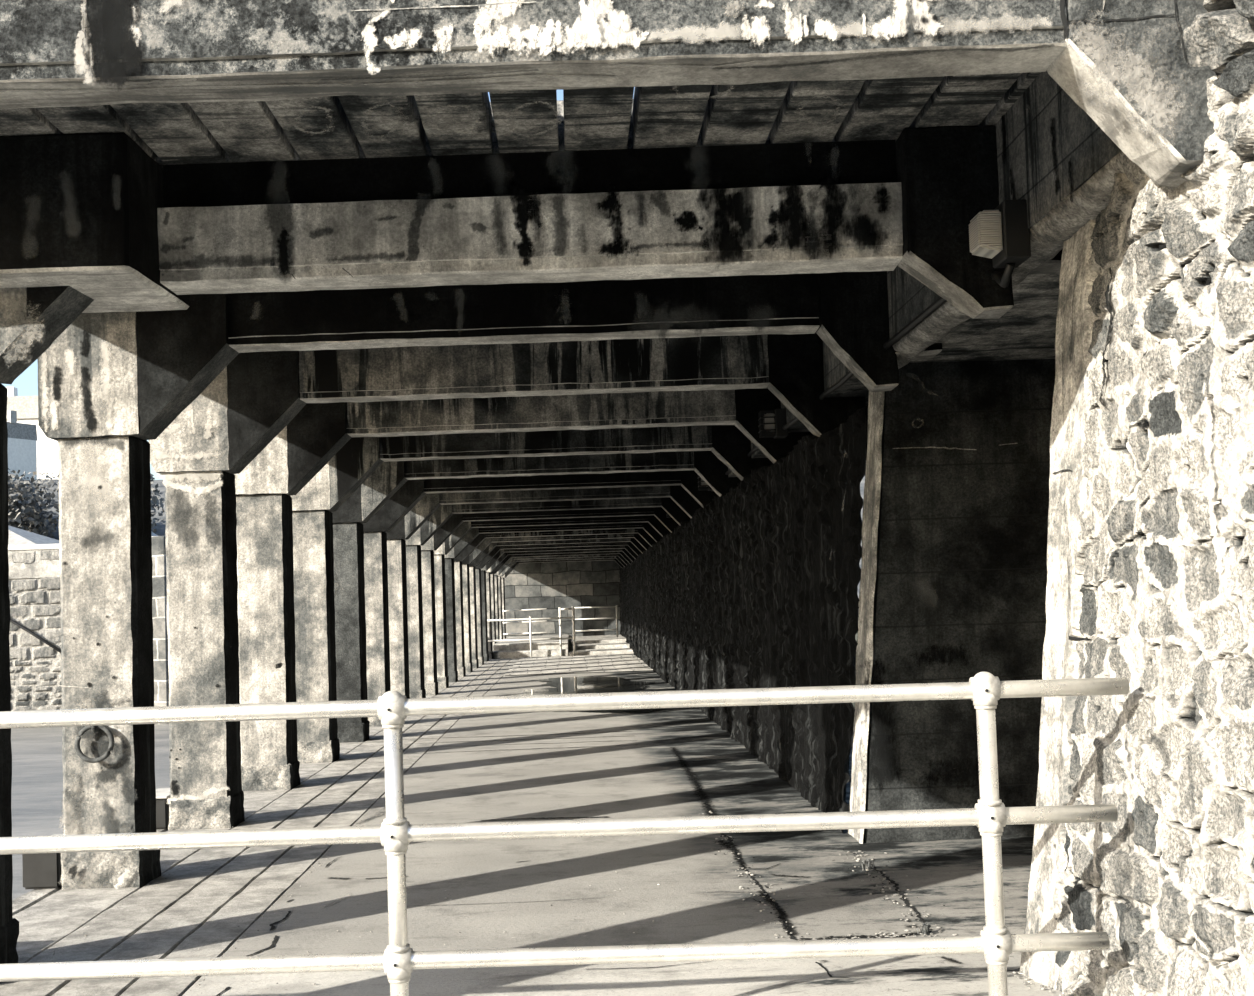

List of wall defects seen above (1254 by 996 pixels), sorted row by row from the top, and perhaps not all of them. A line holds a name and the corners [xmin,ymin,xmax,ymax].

peeling [384,25,453,53]
peeling [473,6,594,56]
spalling [725,0,744,18]
damp [0,0,1054,281]
damp [1050,119,1074,203]
crack [673,751,932,978]